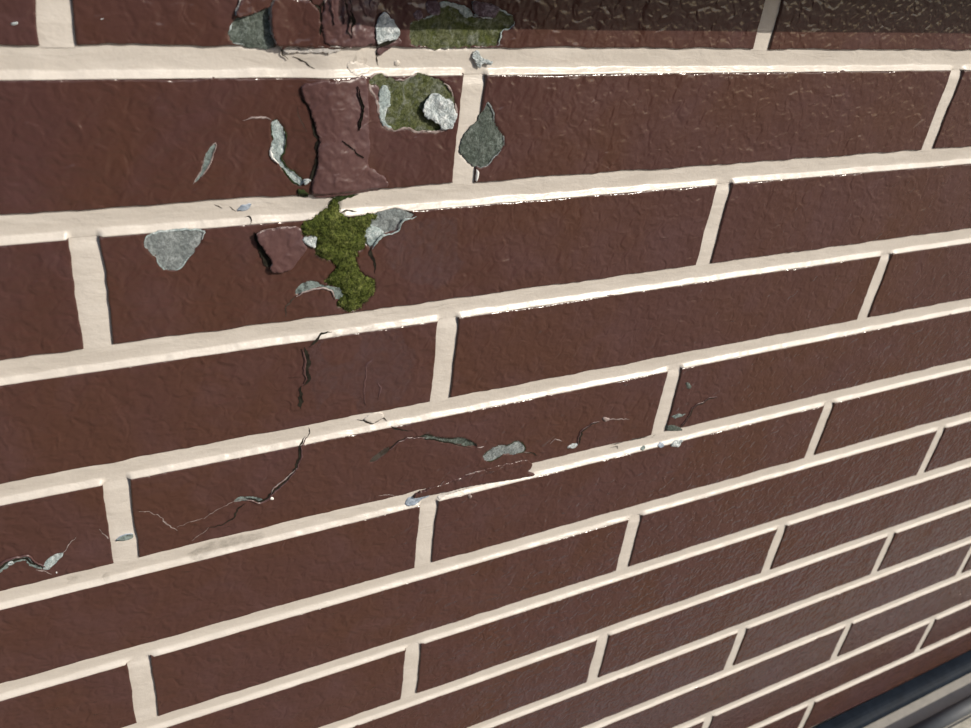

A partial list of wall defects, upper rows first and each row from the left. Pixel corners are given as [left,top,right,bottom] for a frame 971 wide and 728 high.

peeling [228,0,343,54]
peeling [376,0,515,68]
peeling [369,72,458,133]
peeling [243,116,311,197]
peeling [459,102,504,184]
peeling [144,228,206,271]
peeling [214,203,317,273]
peeling [364,208,417,249]
crack [298,331,332,408]
crack [357,412,484,462]
crack [139,429,310,539]
crack [0,538,76,574]